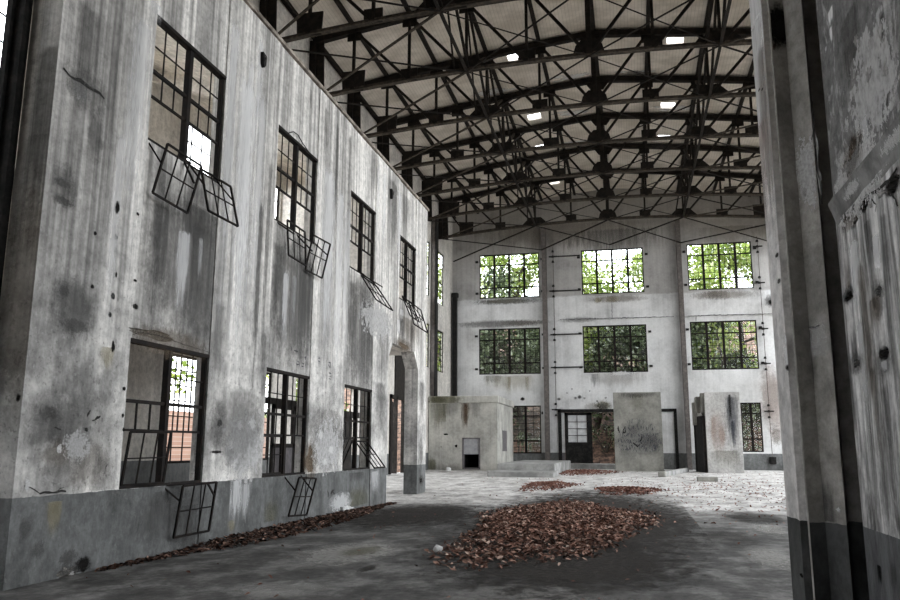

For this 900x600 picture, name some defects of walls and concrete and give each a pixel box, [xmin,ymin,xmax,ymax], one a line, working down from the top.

peeling [834,5,900,194]
peeling [838,164,887,229]
peeling [57,428,91,464]
crack [24,485,66,494]